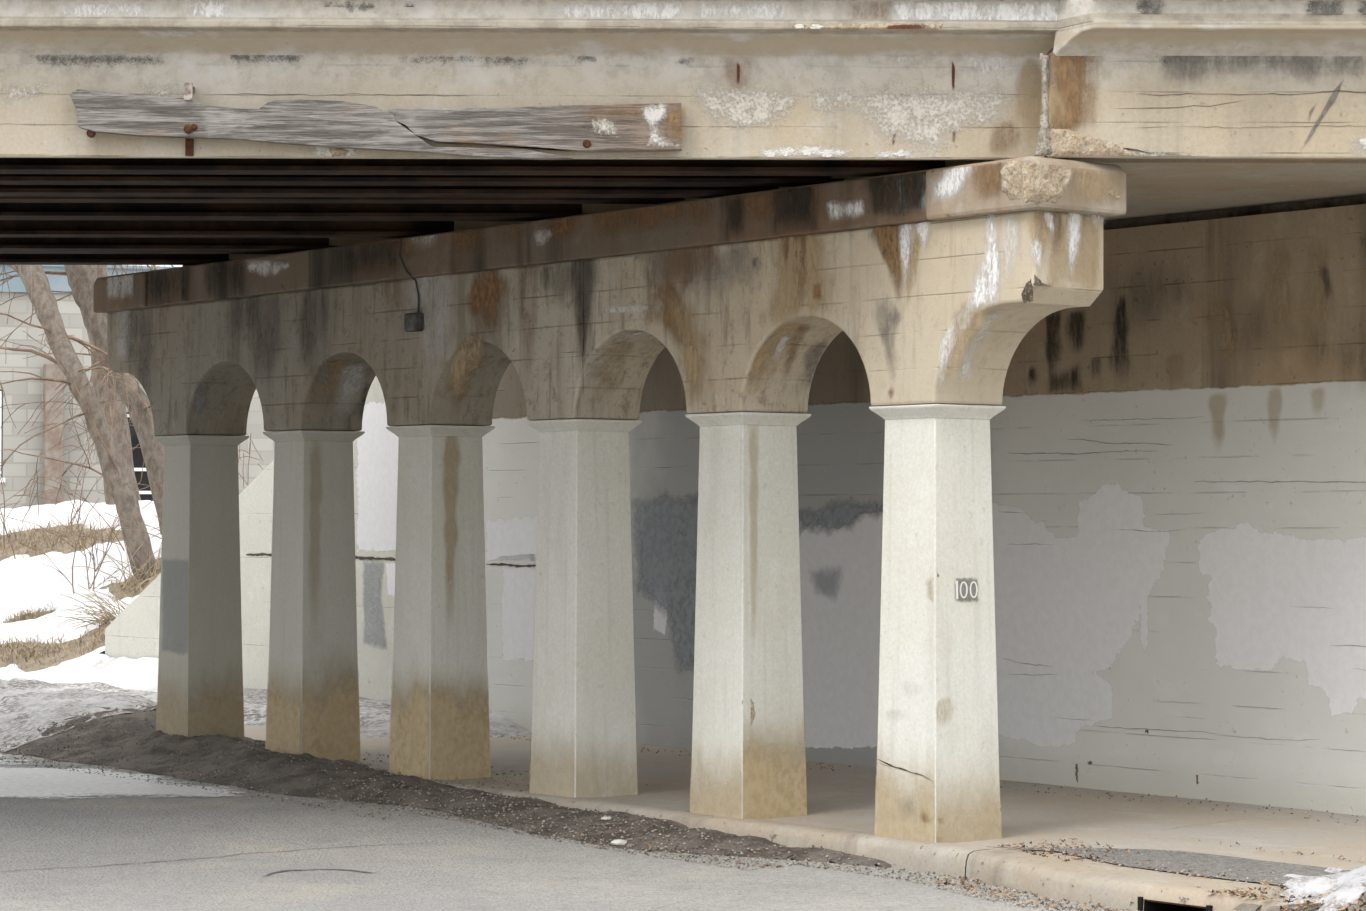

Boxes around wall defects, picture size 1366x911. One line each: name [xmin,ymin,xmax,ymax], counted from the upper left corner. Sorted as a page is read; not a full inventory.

peeling [694,85,796,127]
peeling [763,146,849,157]
peeling [812,85,1012,158]
spalling [1000,53,1193,204]
crack [1113,85,1366,138]
damp [776,162,1001,288]
damp [940,169,1118,375]
damp [1047,313,1083,389]
damp [1115,301,1127,363]
rust [445,438,458,583]